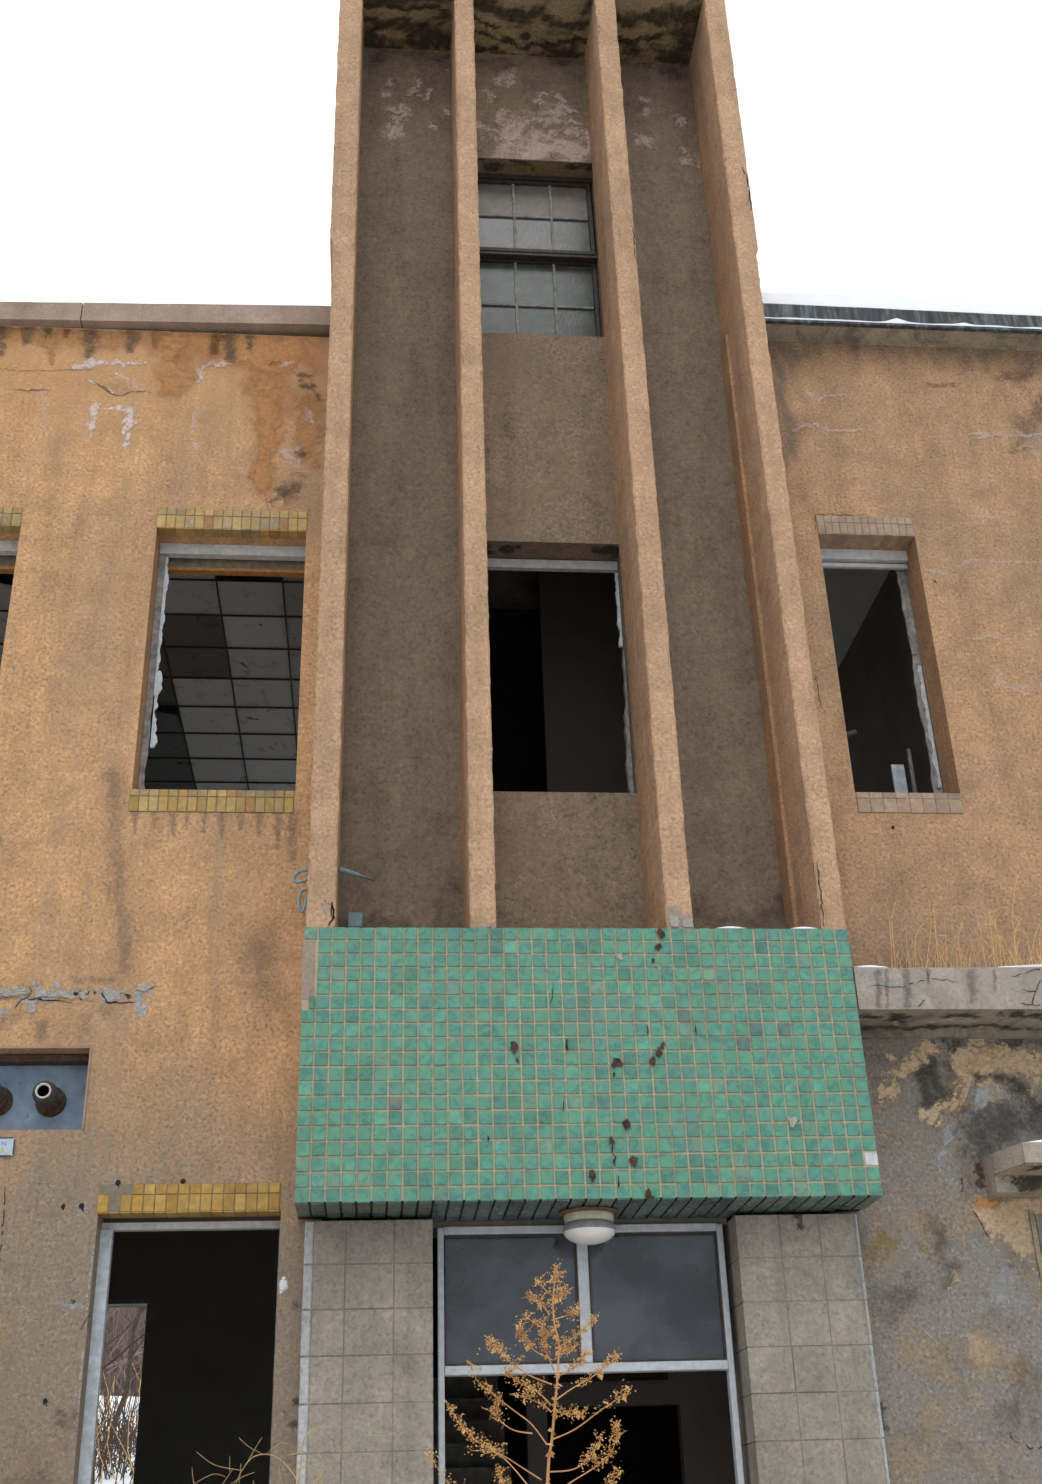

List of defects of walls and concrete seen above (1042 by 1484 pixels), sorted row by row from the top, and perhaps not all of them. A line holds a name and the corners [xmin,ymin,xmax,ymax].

water stain [363,0,452,62]
water stain [474,0,592,172]
water stain [616,3,702,79]
water stain [0,326,170,450]
flaking render [0,983,152,1001]
crack [866,972,959,1007]
crack [1013,969,1040,1006]
spalling [649,1042,666,1065]
water stain [860,969,1042,1109]
peeling [876,1039,1042,1129]
water stain [938,1073,1042,1186]
peeling [970,1166,1042,1287]